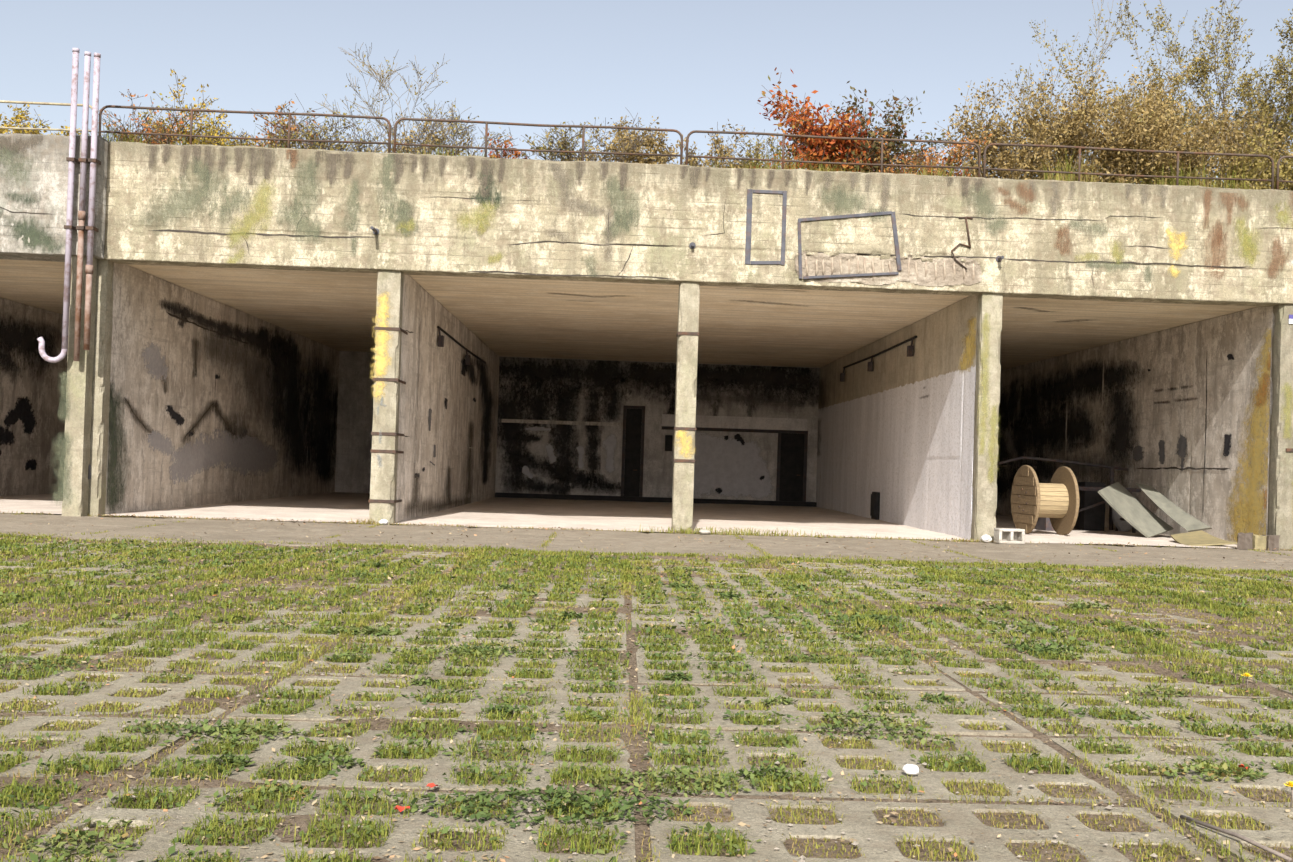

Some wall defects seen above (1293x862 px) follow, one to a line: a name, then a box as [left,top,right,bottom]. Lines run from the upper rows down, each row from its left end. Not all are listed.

water stain [0,135,41,154]
rust [999,184,1034,213]
spalling [795,216,982,286]
rust [1205,189,1245,277]
rust [1269,240,1285,277]
water stain [110,385,152,435]
water stain [183,401,238,442]